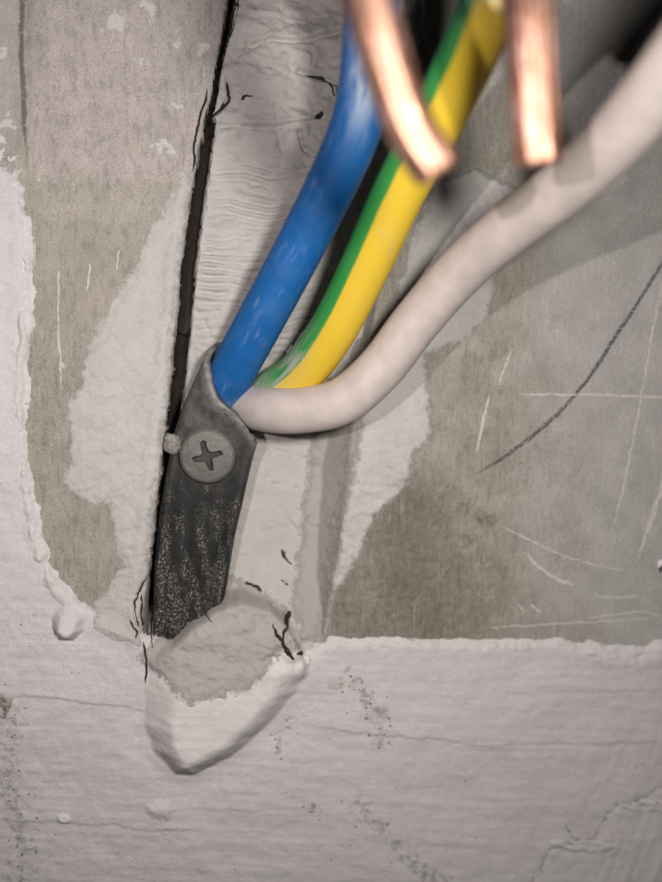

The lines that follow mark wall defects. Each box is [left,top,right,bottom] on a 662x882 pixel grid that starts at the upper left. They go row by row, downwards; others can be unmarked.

crack [130,0,253,683]
peeling [13,214,76,604]
crack [245,581,262,592]
crack [281,550,292,585]
crack [272,611,303,660]
peeling [326,636,662,660]